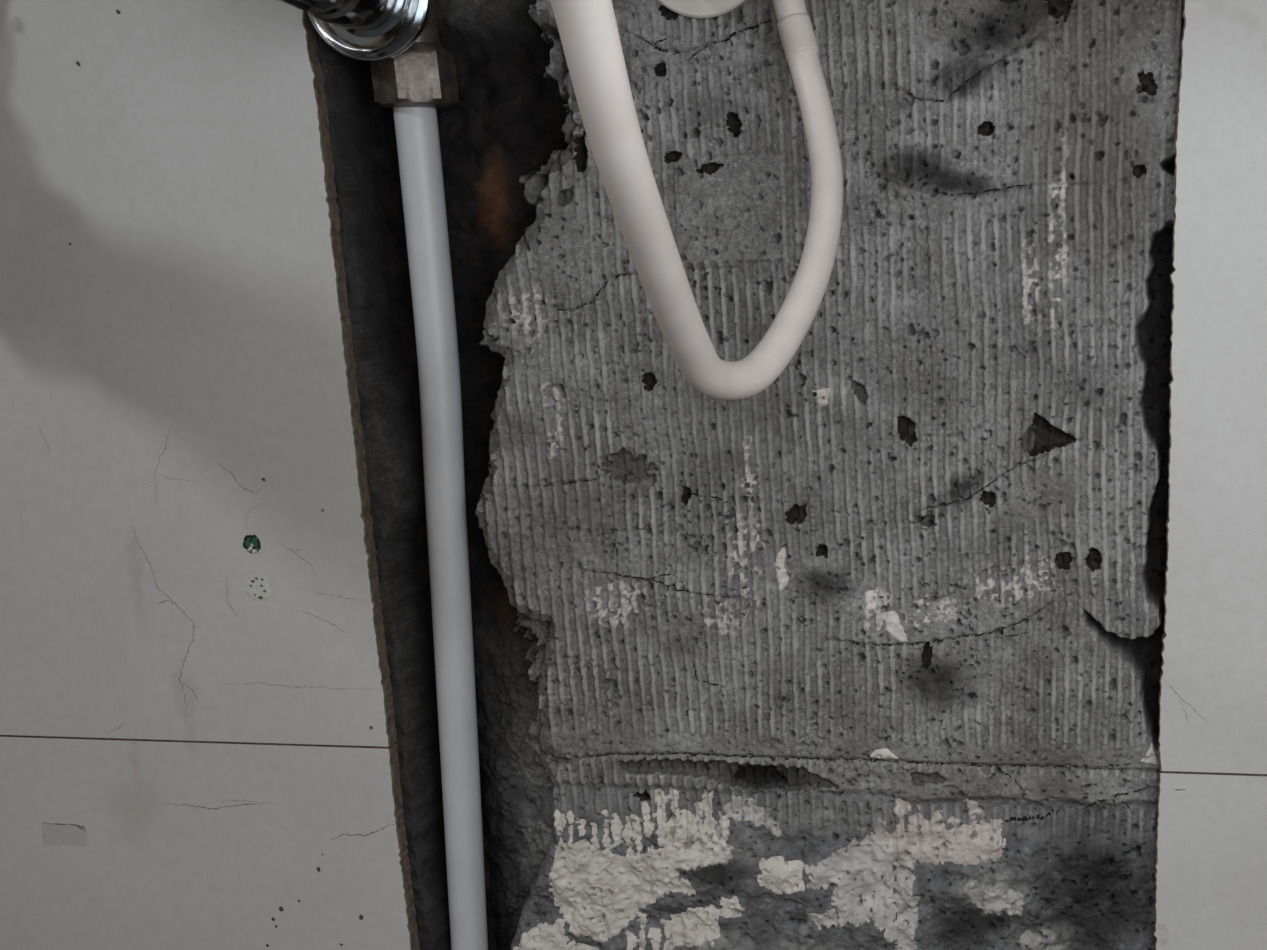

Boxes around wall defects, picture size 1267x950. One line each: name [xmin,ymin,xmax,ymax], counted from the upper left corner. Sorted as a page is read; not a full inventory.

spalling [658,5,679,20]
spalling [538,9,588,174]
crack [895,56,1007,102]
spalling [977,121,995,136]
spalling [898,416,917,447]
spalling [475,186,574,764]
spalling [1055,548,1102,572]
peeling [865,588,908,642]
crack [856,609,1042,646]
spalling [553,758,839,856]
peeling [872,798,1003,843]
peeling [636,904,721,950]